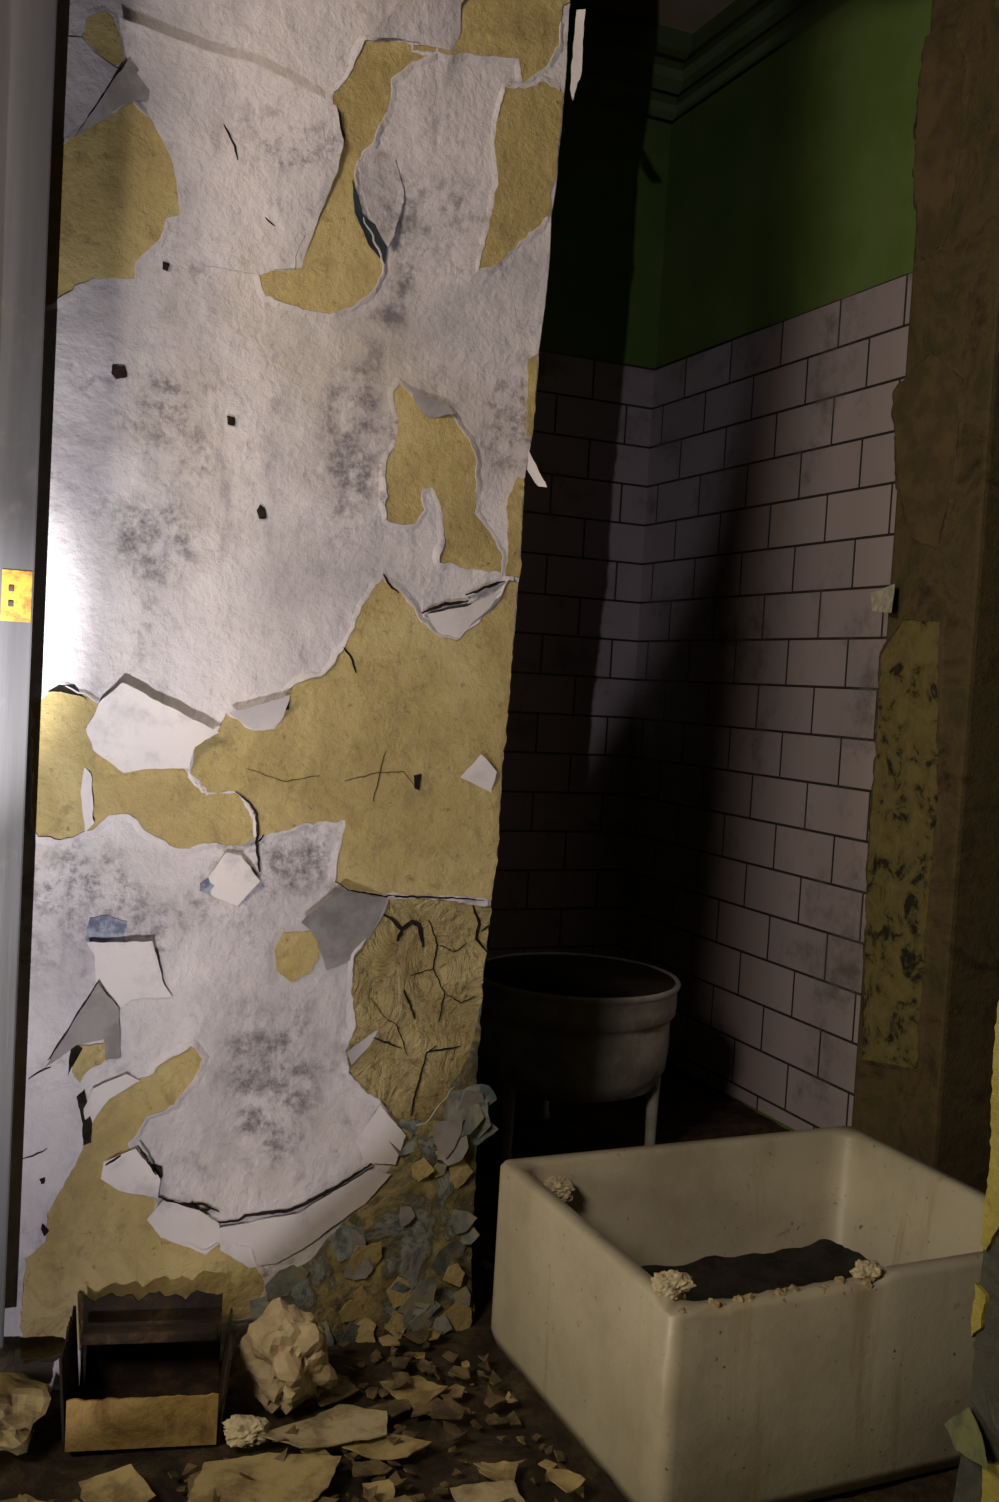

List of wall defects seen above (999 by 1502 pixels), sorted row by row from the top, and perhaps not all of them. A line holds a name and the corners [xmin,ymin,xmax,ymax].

peeling [45,0,586,322]
peeling [12,354,547,1364]
crack [336,882,492,1116]
peeling [981,1002,999,1251]
peeling [971,1282,989,1338]
peeling [944,1407,999,1502]